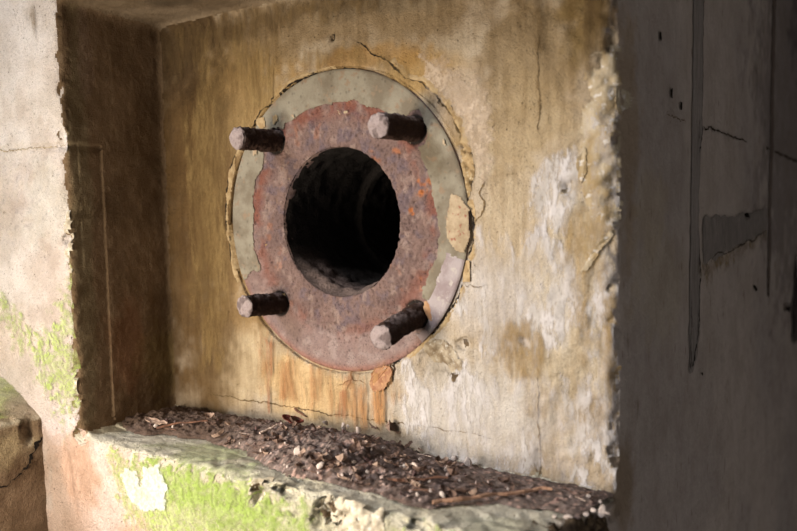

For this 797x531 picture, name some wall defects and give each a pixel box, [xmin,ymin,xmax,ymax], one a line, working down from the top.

crack [668,114,747,152]
damp [504,149,622,489]
corrosion [340,363,393,425]
damp [401,360,431,447]
damp [442,361,484,464]
crack [0,437,43,488]
spalling [524,512,609,531]